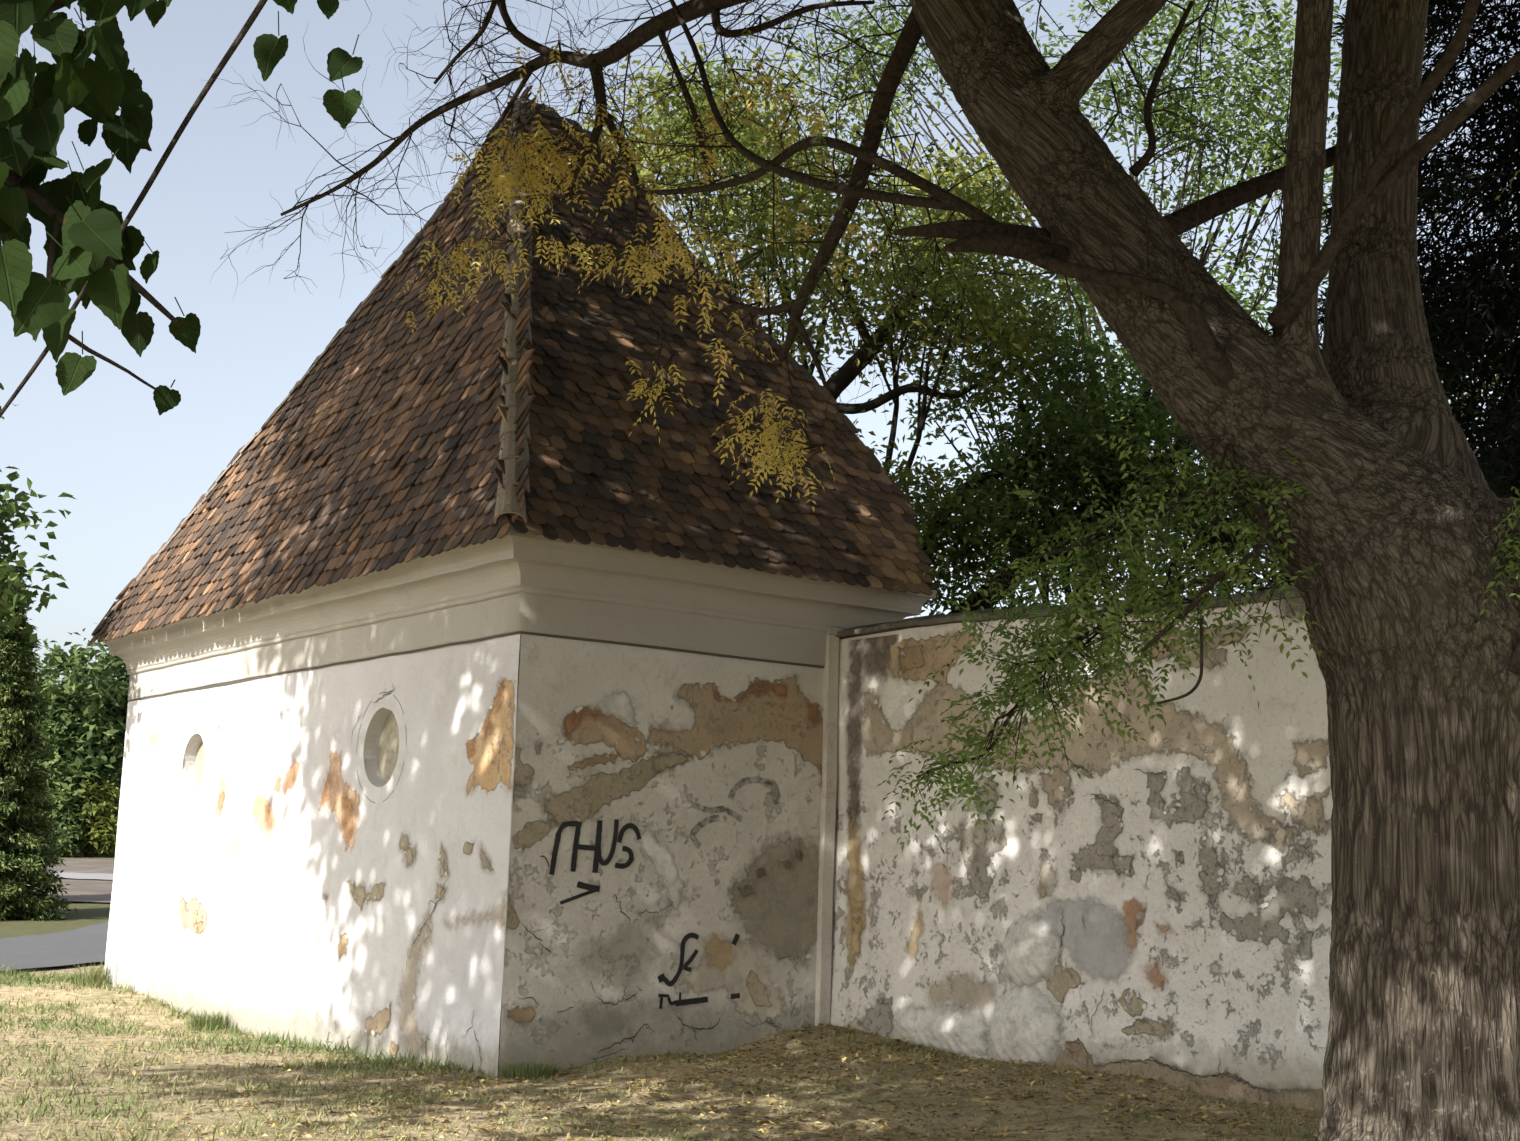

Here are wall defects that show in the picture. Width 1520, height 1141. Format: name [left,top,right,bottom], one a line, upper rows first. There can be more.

peeling [399,833,418,866]
spalling [466,678,542,798]
spalling [513,675,824,852]
leakage [847,634,897,832]
peeling [859,618,1330,961]
spalling [178,896,207,935]
peeling [364,842,494,1056]
spalling [863,997,894,1037]
peeling [1041,961,1086,1006]